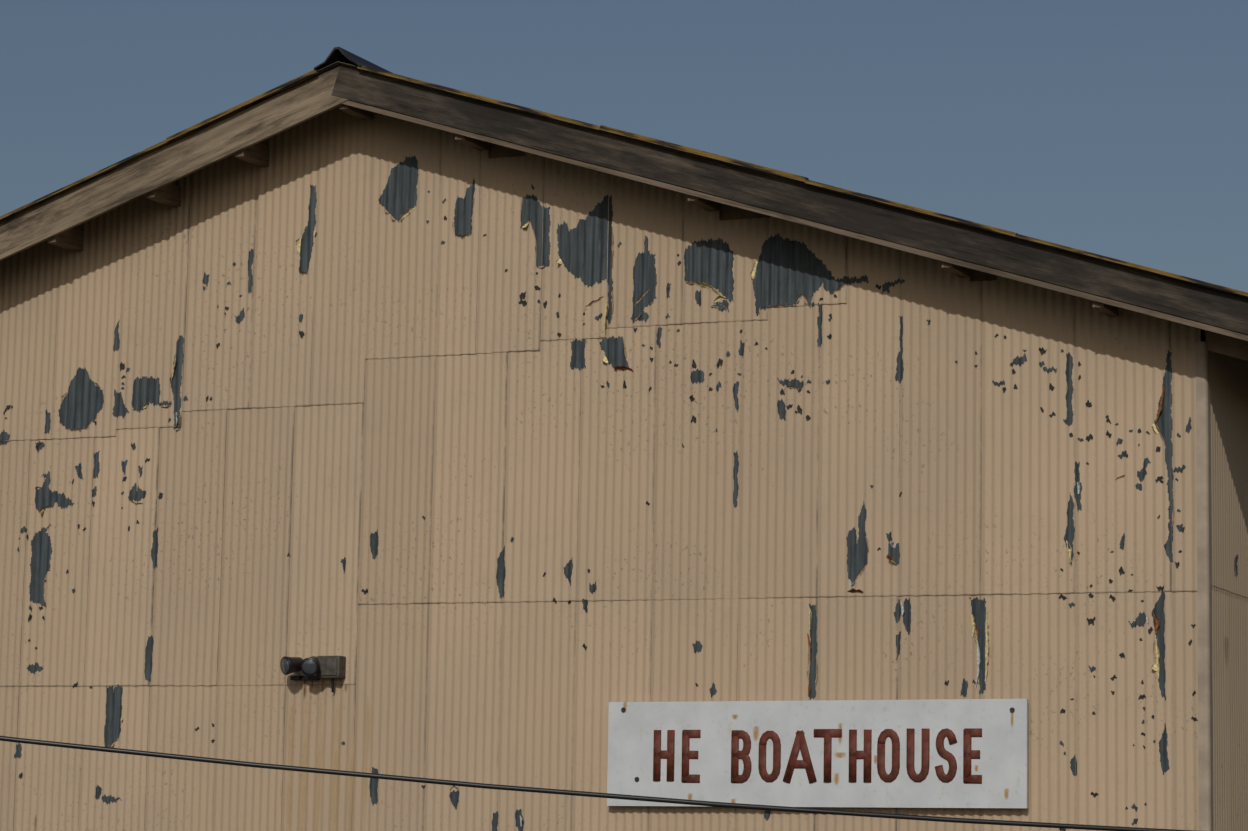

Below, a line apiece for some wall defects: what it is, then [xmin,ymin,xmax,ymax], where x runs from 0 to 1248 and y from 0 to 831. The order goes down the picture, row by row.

peeling [296,184,317,275]
peeling [379,156,430,222]
peeling [441,179,486,244]
peeling [519,184,734,389]
peeling [750,233,905,347]
peeling [35,320,188,452]
peeling [669,329,767,423]
peeling [17,451,100,622]
peeling [846,501,900,593]
peeling [73,682,123,748]
peeling [944,597,989,697]
peeling [1109,566,1169,775]